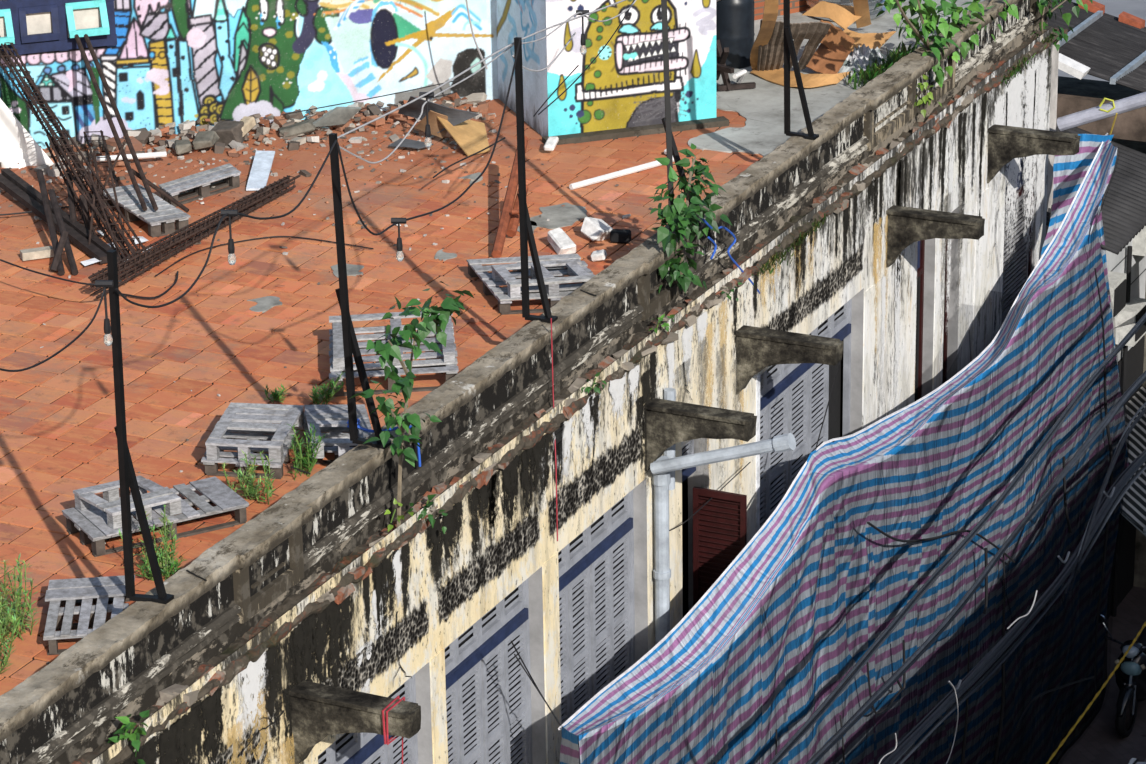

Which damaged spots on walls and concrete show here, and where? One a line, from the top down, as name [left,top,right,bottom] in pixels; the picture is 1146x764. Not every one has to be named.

peeling [771,261,780,303]
damp [795,219,813,299]
peeling [806,227,814,266]
damp [835,156,907,286]
peeling [812,56,1048,214]
damp [921,92,987,216]
peeling [994,154,1044,266]
damp [582,351,657,489]
spalling [412,443,509,533]
damp [425,421,564,595]
damp [263,543,411,764]
damp [120,685,226,764]